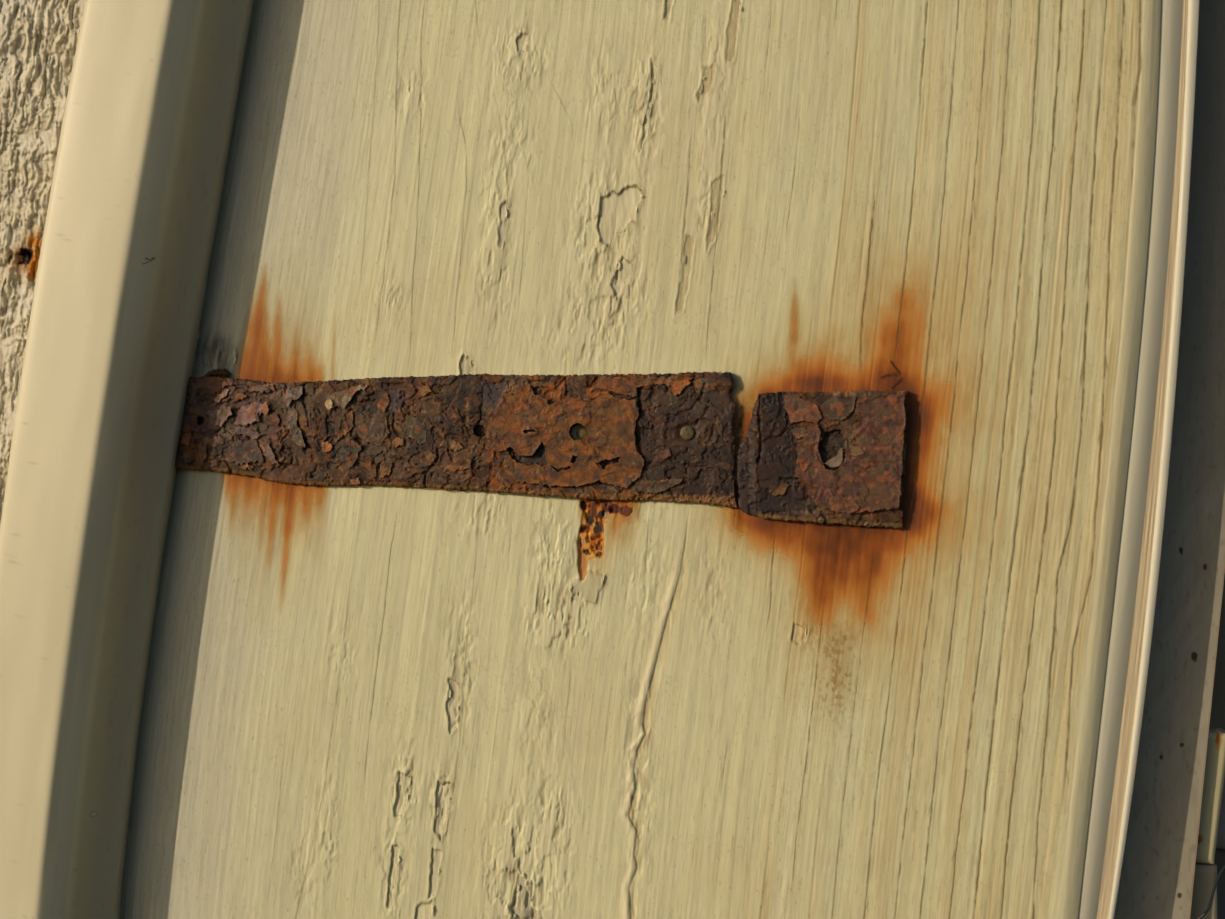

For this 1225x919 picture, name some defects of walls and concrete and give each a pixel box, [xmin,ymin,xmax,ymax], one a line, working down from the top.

rust [17,233,42,282]
peeling [597,184,643,245]
peeling [610,256,633,300]
rust [204,283,327,580]
rust [322,384,471,485]
rust [485,376,691,533]
rust [723,287,955,628]
peeling [394,772,411,817]
peeling [387,845,401,908]
peeling [415,781,451,919]